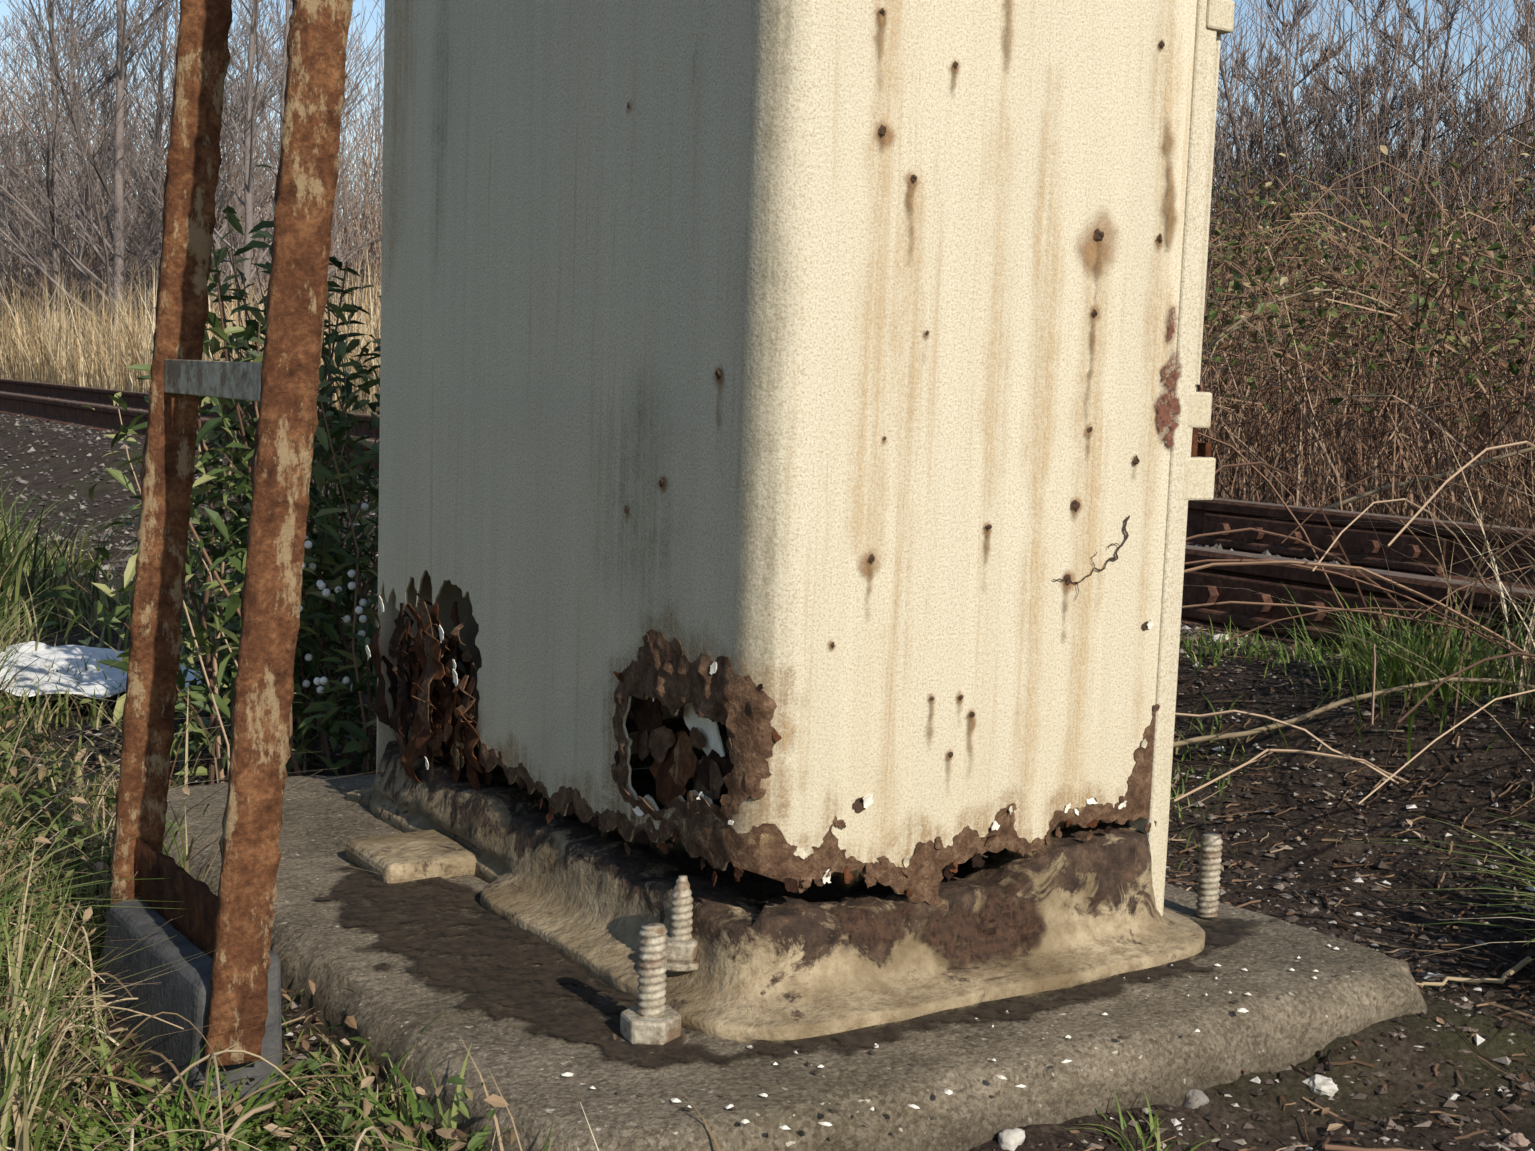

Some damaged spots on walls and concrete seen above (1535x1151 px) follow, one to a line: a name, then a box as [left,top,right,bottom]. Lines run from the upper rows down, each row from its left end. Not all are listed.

damp [314,864,1279,1068]